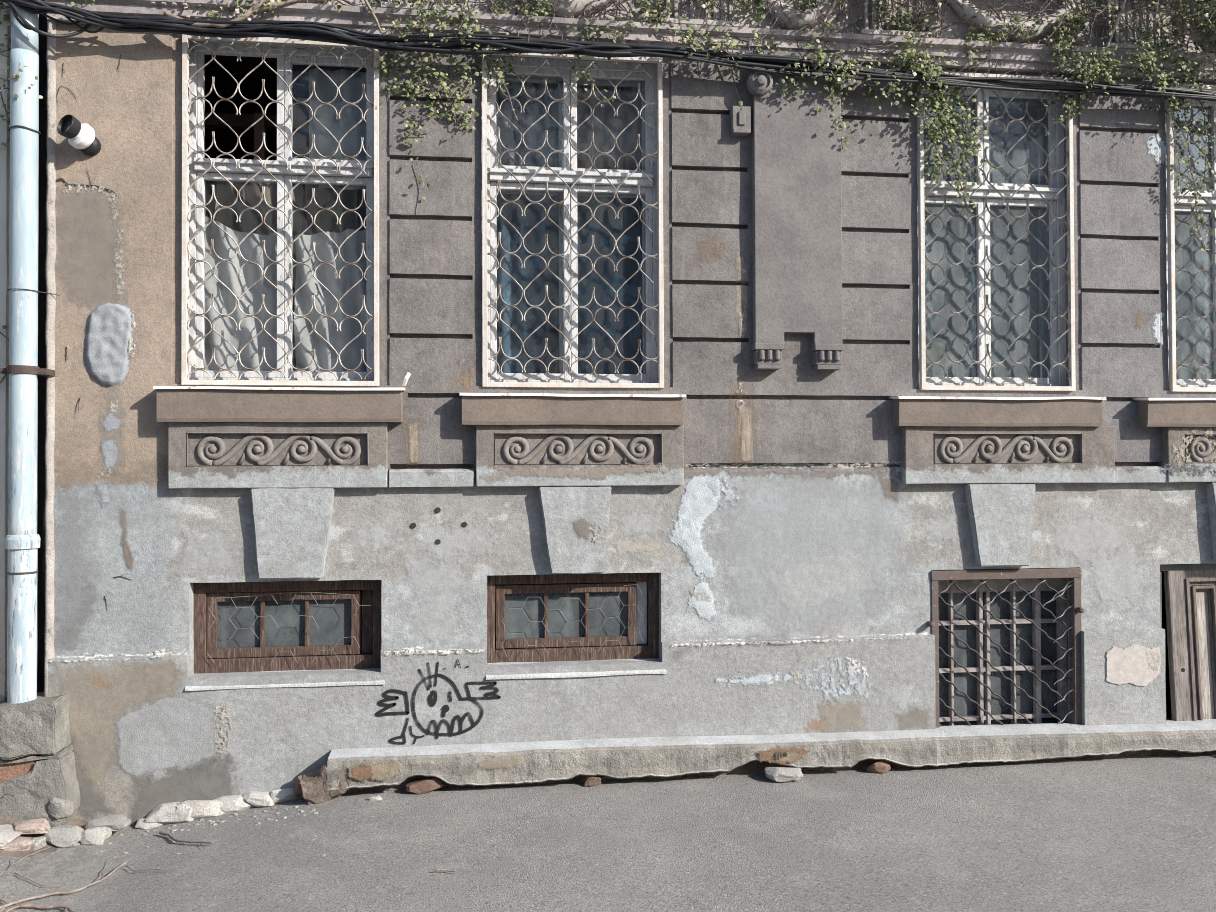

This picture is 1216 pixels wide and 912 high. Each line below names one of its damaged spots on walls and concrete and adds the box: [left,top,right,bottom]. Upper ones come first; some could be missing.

flaking render [63,182,128,303]
peeling [480,463,667,481]
peeling [1164,427,1216,478]
spalling [574,519,609,543]
peeling [668,461,902,622]